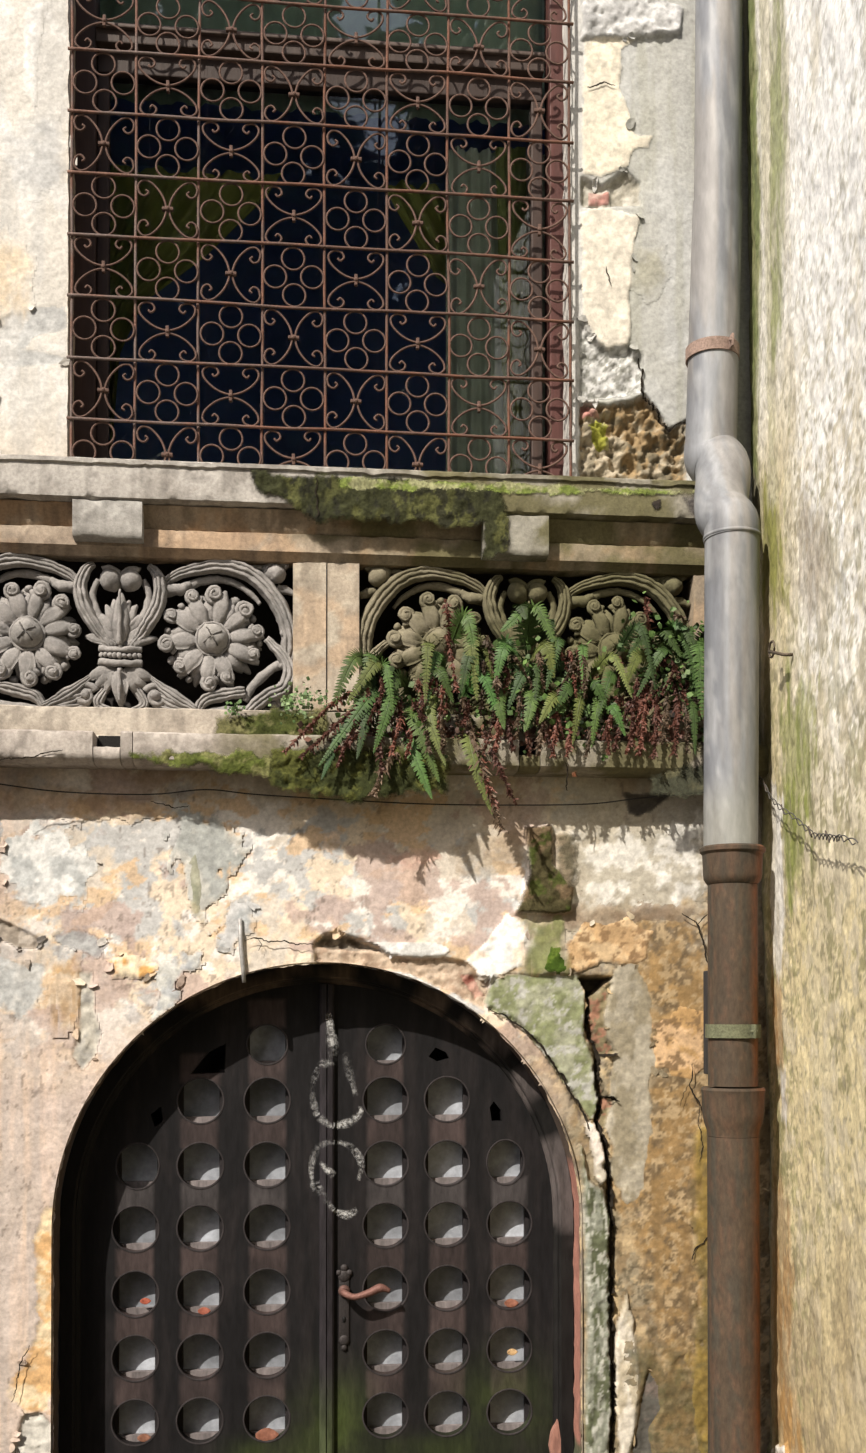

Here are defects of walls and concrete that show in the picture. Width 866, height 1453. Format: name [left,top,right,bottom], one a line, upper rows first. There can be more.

peeling [576,31,687,480]
damp [792,466,834,663]
peeling [0,794,260,1070]
flaking render [312,927,504,1013]
peeling [565,911,654,1186]
peeling [649,1006,704,1079]
peeling [4,1204,55,1453]
crack [490,996,620,1453]
flaking render [633,1369,660,1453]